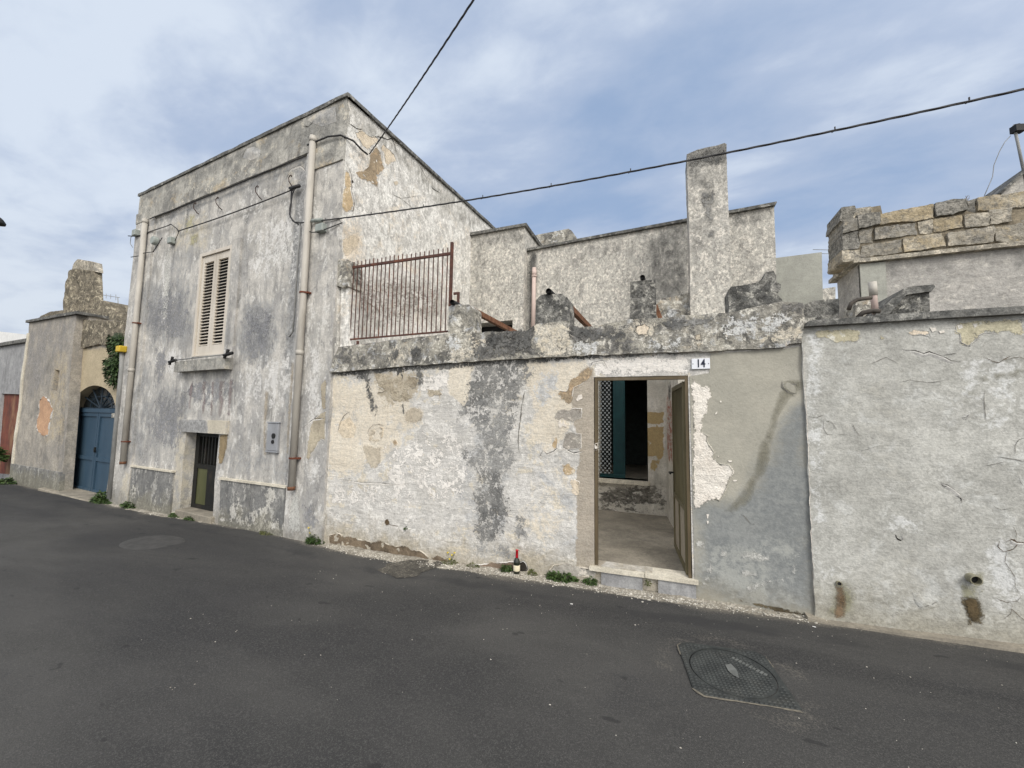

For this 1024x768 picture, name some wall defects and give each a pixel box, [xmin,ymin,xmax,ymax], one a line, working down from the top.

peeling [342,130,396,213]
peeling [814,328,864,343]
peeling [909,318,1024,346]
crack [873,349,960,383]
peeling [35,396,53,436]
leakage [334,254,688,559]
peeling [552,368,598,451]
peeling [691,380,737,524]
crack [941,483,963,503]
spalling [328,533,448,561]
crack [994,507,1024,620]
rust [835,588,846,618]